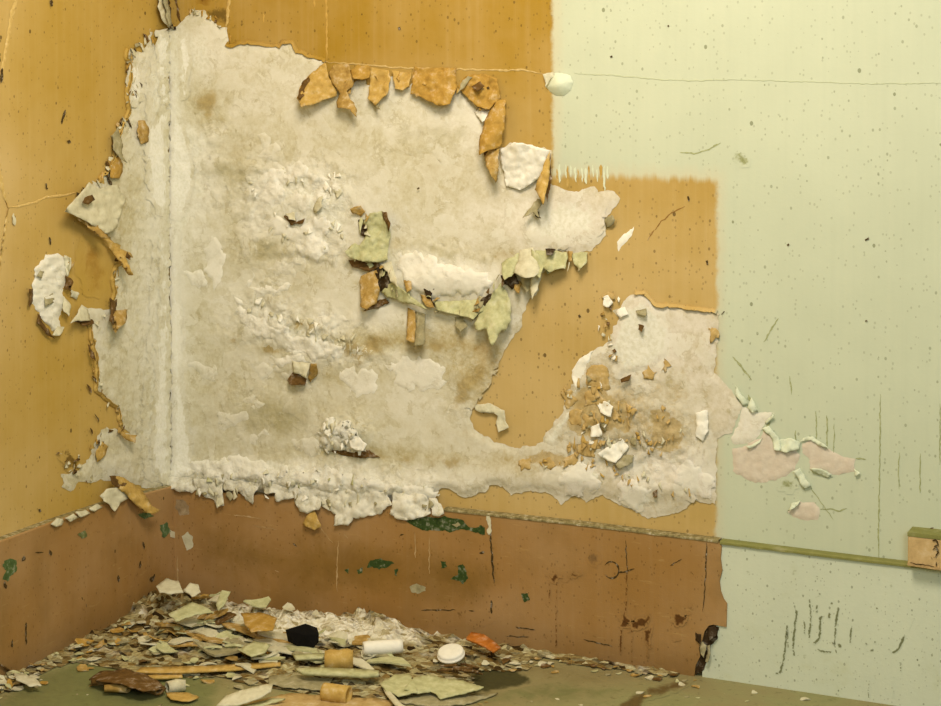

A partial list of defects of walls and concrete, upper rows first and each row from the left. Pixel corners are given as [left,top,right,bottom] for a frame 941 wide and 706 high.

crack [0,0,17,83]
crack [158,0,181,30]
crack [224,0,232,27]
crack [0,164,75,282]
peeling [29,8,860,550]
spalling [695,625,719,673]